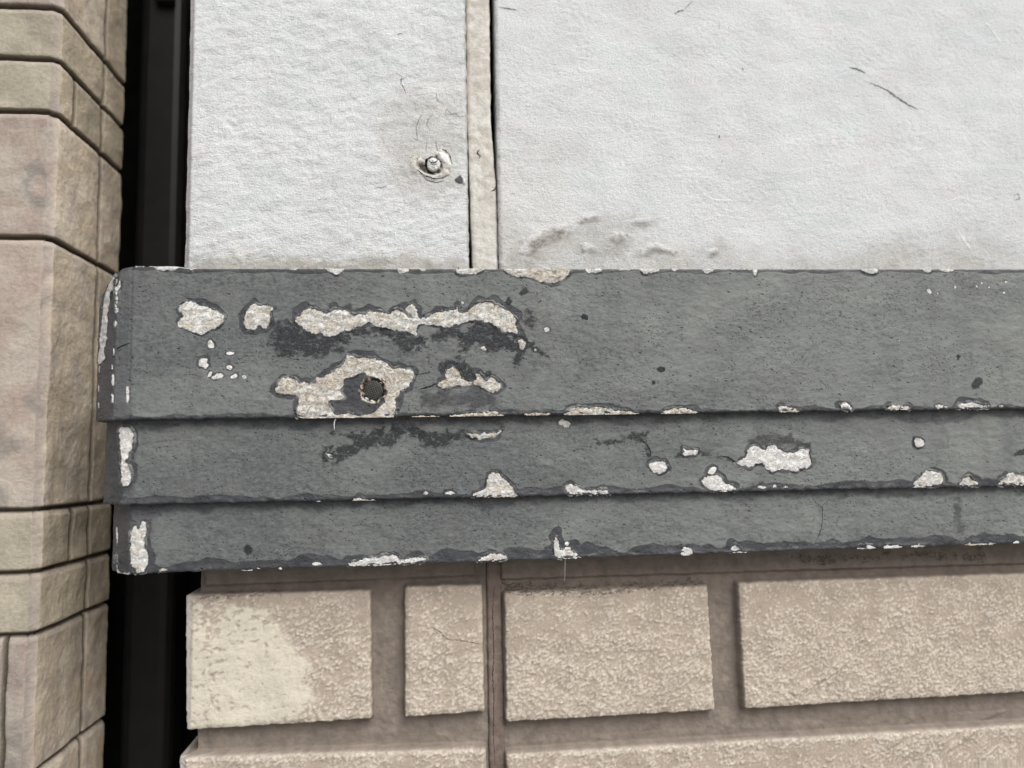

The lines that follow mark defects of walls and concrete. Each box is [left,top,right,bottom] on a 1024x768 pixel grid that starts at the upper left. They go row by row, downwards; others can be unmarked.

peeling [176,299,247,380]
peeling [242,302,275,332]
peeling [294,300,538,352]
peeling [274,353,416,420]
peeling [435,365,502,395]
peeling [116,424,137,489]
peeling [470,470,519,498]
peeling [735,443,813,489]
peeling [910,468,980,488]
peeling [113,520,167,575]
peeling [347,552,429,567]
peeling [551,535,583,561]